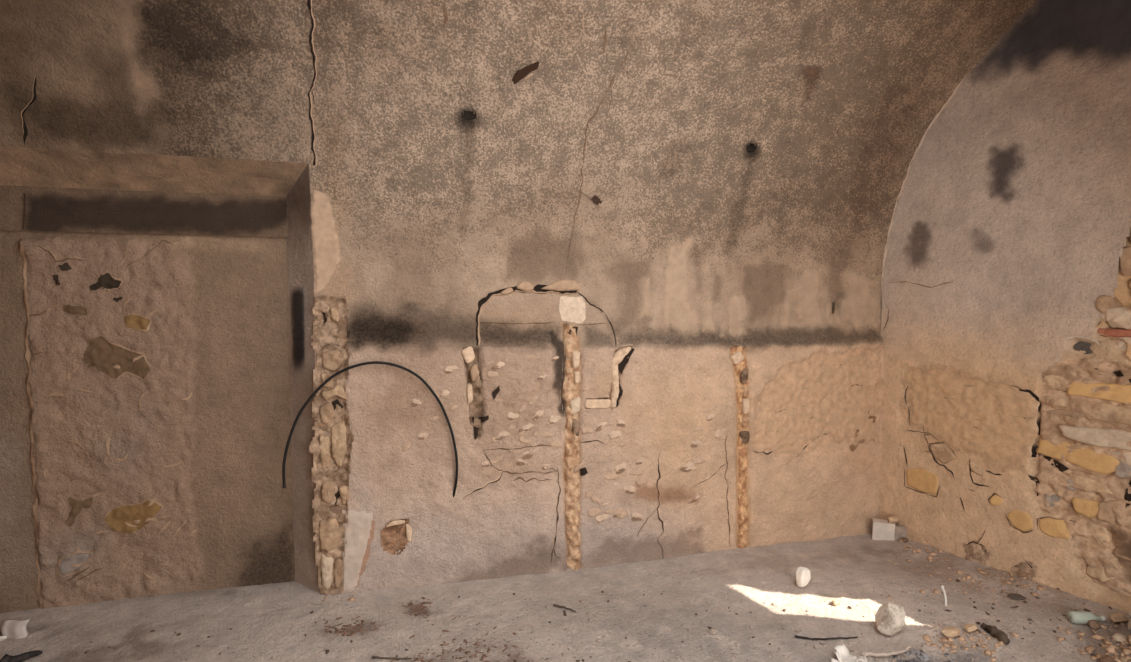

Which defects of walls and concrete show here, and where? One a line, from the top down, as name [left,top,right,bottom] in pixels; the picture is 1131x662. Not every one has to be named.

crack [307,0,317,165]
crack [20,75,37,146]
peeling [89,272,123,302]
peeling [84,336,152,379]
spalling [1065,336,1099,354]
spalling [309,295,412,595]
peeling [66,497,93,527]
peeling [104,499,164,534]
crack [463,445,561,566]
crack [637,453,664,559]
flaking render [904,468,940,497]
flaking render [988,493,1075,539]